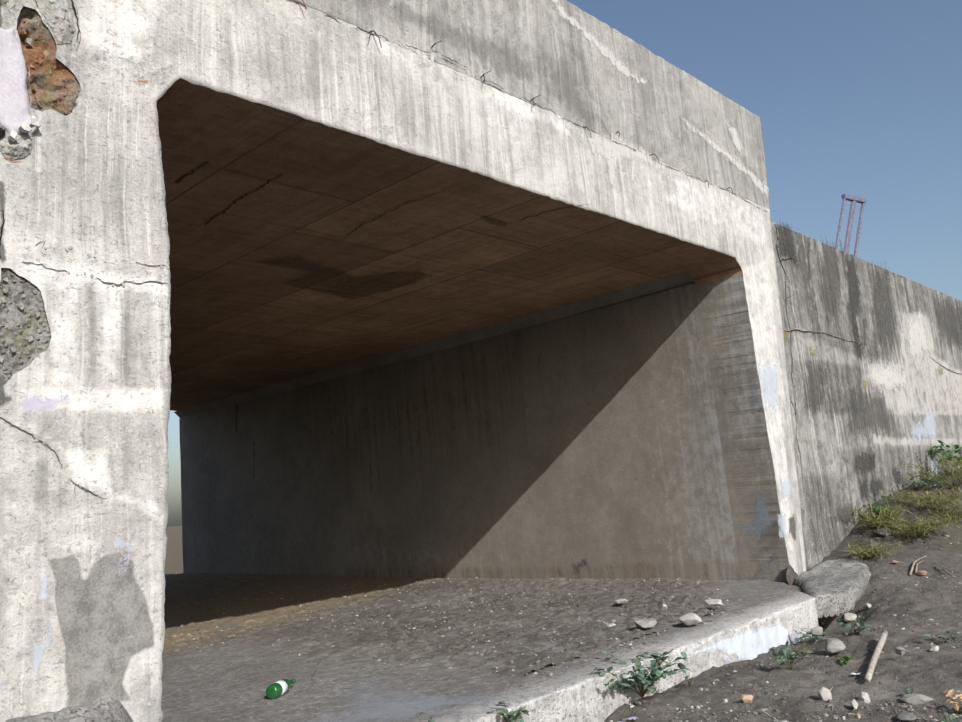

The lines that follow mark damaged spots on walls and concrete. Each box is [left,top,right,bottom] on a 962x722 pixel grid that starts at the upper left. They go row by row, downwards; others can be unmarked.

crack [205,173,288,226]
crack [288,0,863,486]
spalling [0,268,51,384]
crack [0,417,106,499]